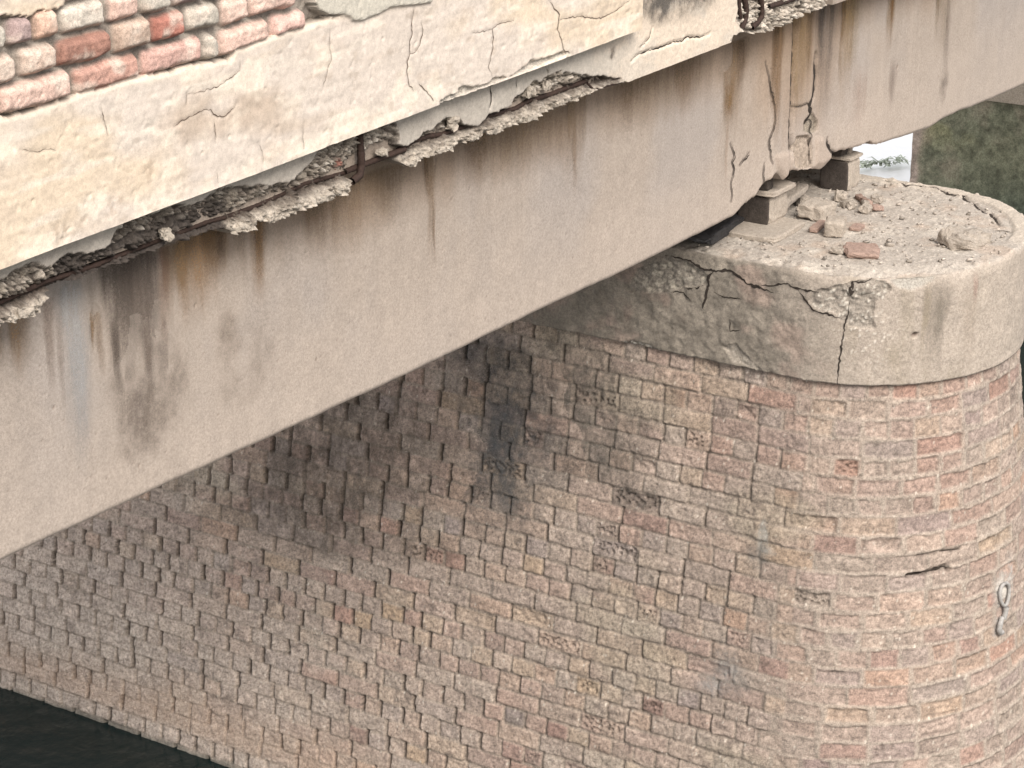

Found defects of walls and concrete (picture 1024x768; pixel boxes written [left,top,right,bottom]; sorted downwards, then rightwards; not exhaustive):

crack [550,0,630,52]
crack [631,29,705,61]
water stain [819,4,833,66]
crack [178,74,236,142]
crack [731,24,834,199]
spalling [0,51,624,327]
corrosion [164,230,227,286]
corrosion [251,221,264,268]
water stain [103,250,166,364]
crack [665,255,872,384]
spalling [808,277,937,329]
crack [906,548,959,575]